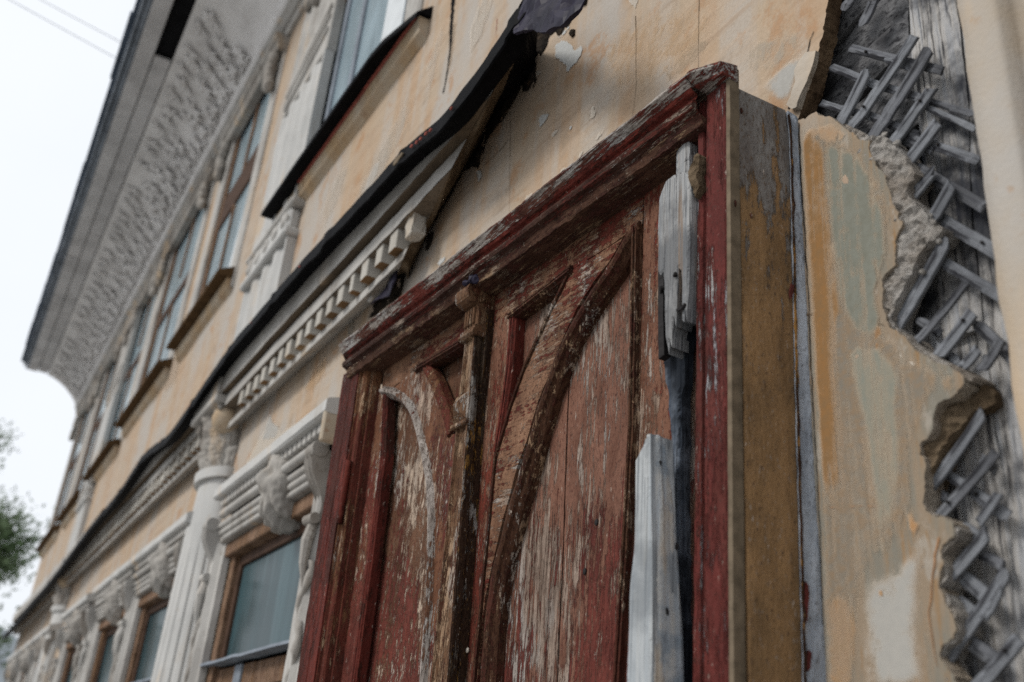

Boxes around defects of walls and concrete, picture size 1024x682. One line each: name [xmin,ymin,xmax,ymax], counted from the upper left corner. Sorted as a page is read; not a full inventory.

crack [442,0,455,94]
spalling [555,27,582,71]
flaking render [816,0,1024,682]